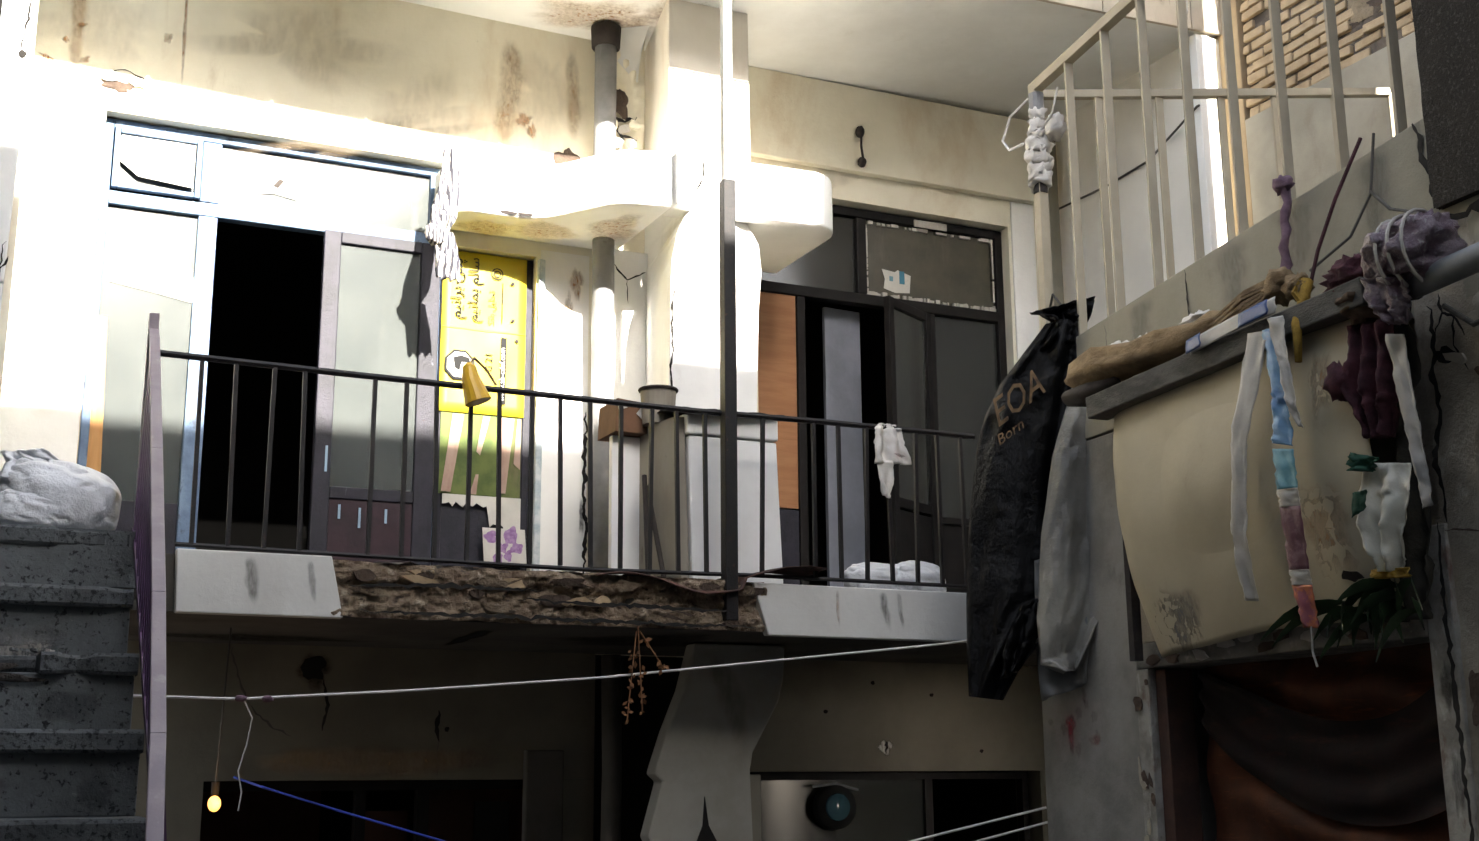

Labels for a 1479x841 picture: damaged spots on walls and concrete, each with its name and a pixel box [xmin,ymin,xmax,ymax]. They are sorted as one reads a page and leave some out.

crack [18,0,32,58]
peeling [99,69,151,97]
crack [0,243,8,269]
spalling [331,560,767,632]
crack [1426,294,1479,841]